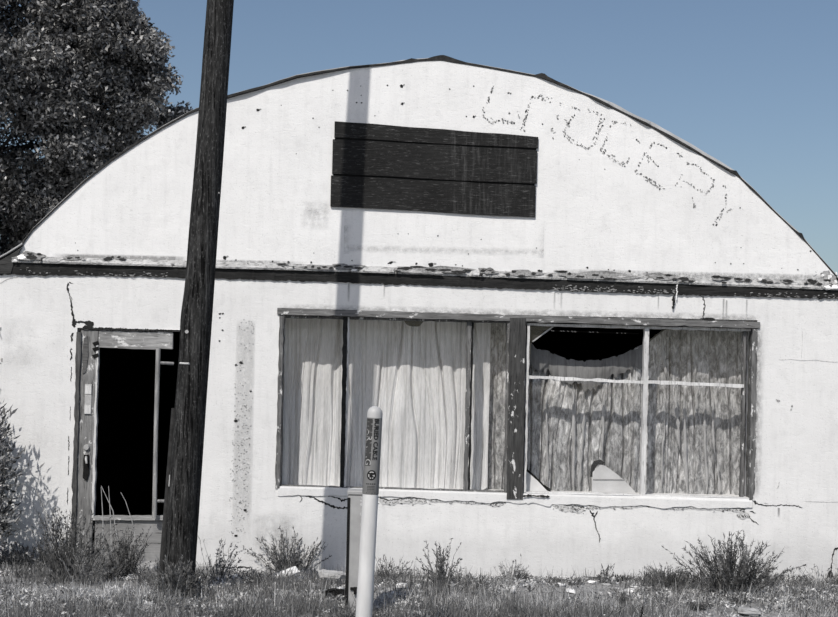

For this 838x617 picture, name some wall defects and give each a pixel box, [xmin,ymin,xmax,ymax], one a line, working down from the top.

flaking render [12,251,46,274]
flaking render [276,261,365,271]
flaking render [393,261,695,293]
flaking render [711,275,794,284]
flaking render [735,270,838,298]
crack [66,282,173,381]
crack [523,492,550,500]